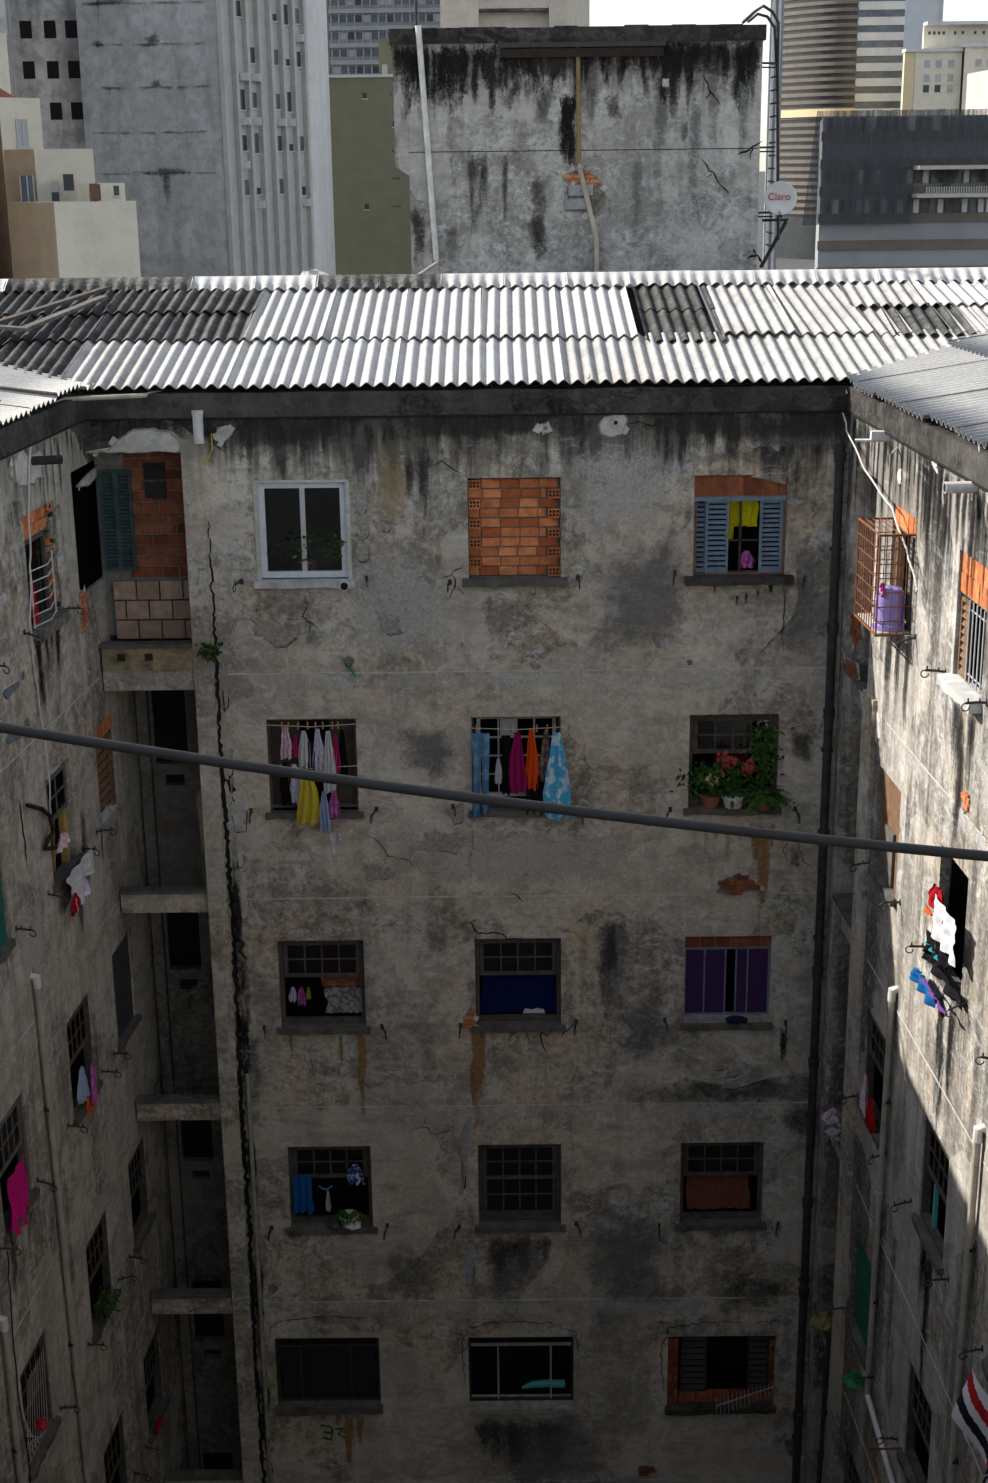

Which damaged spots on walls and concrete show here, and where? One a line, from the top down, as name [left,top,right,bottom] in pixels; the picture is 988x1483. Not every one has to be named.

damp [393,41,760,182]
damp [412,215,424,260]
damp [468,156,508,222]
damp [530,180,547,259]
spalling [76,428,182,491]
damp [640,413,988,615]
spalling [716,871,765,895]
corrosion [751,824,775,904]
crack [207,521,384,1483]
corrosion [339,1035,366,1114]
corrosion [470,1032,486,1120]